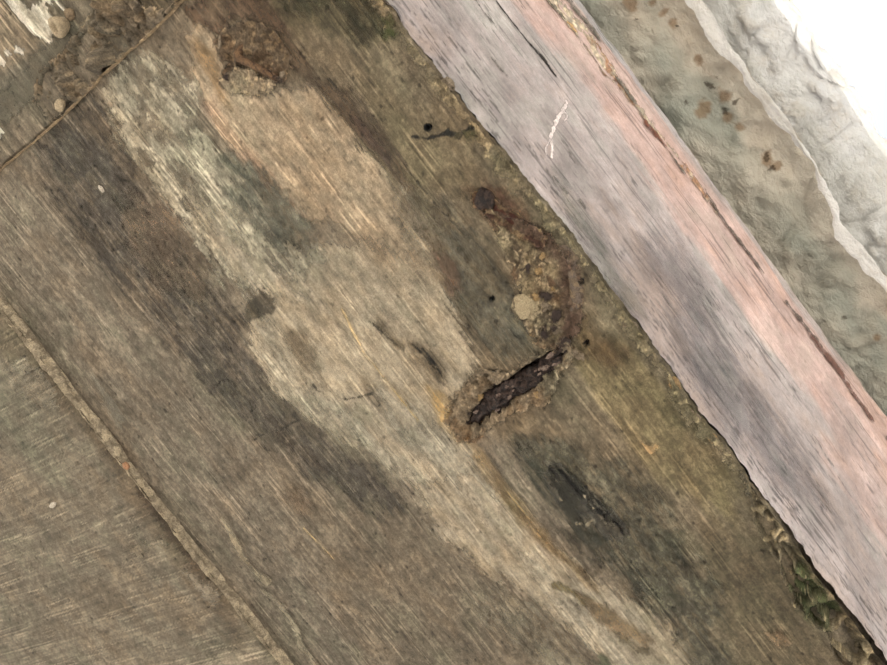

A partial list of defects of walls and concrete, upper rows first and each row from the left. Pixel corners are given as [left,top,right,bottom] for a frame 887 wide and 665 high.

damp [4,357,59,410]
spalling [213,17,294,97]
damp [33,0,732,665]
spalling [371,0,759,499]